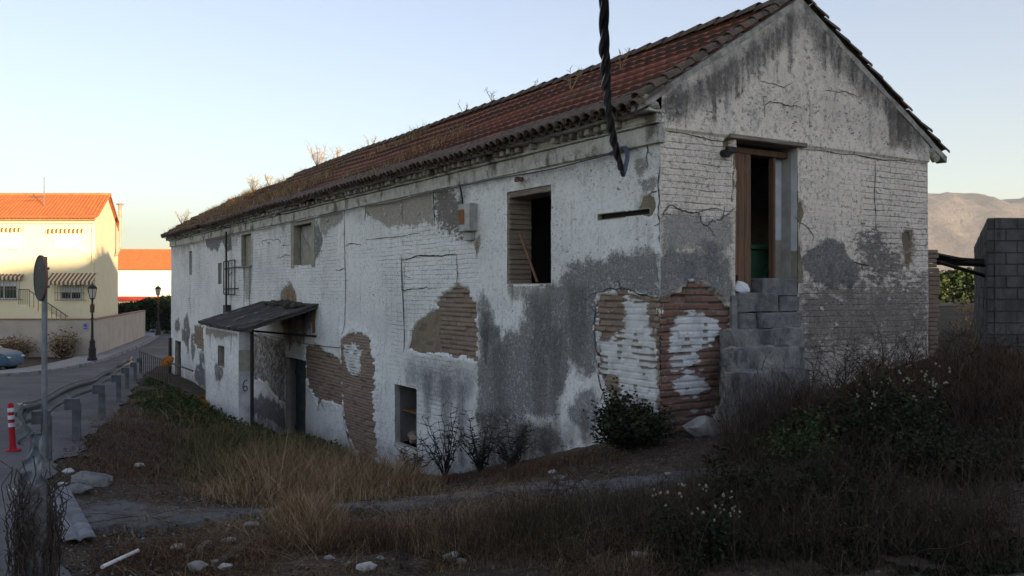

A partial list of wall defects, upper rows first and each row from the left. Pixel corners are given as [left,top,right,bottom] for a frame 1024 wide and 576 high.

leakage [684,14,793,118]
crack [762,81,801,108]
leakage [822,30,920,149]
peeling [366,187,466,246]
spalling [635,158,658,217]
crack [646,145,736,242]
leakage [801,238,860,290]
flaking render [254,334,286,430]
flaking render [306,343,343,405]
flaking render [409,285,478,362]
leakage [407,240,736,467]
flaking render [594,278,730,435]